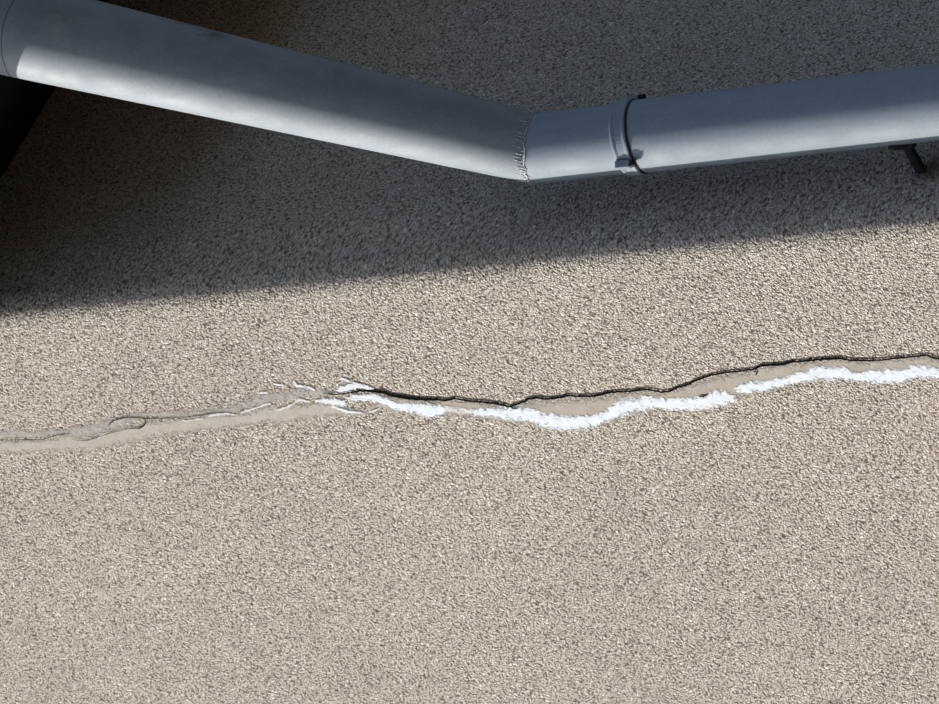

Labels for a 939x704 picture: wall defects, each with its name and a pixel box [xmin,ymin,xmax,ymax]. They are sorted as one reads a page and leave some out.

crack [5,409,244,441]
crack [323,354,939,409]
water stain [350,365,939,431]